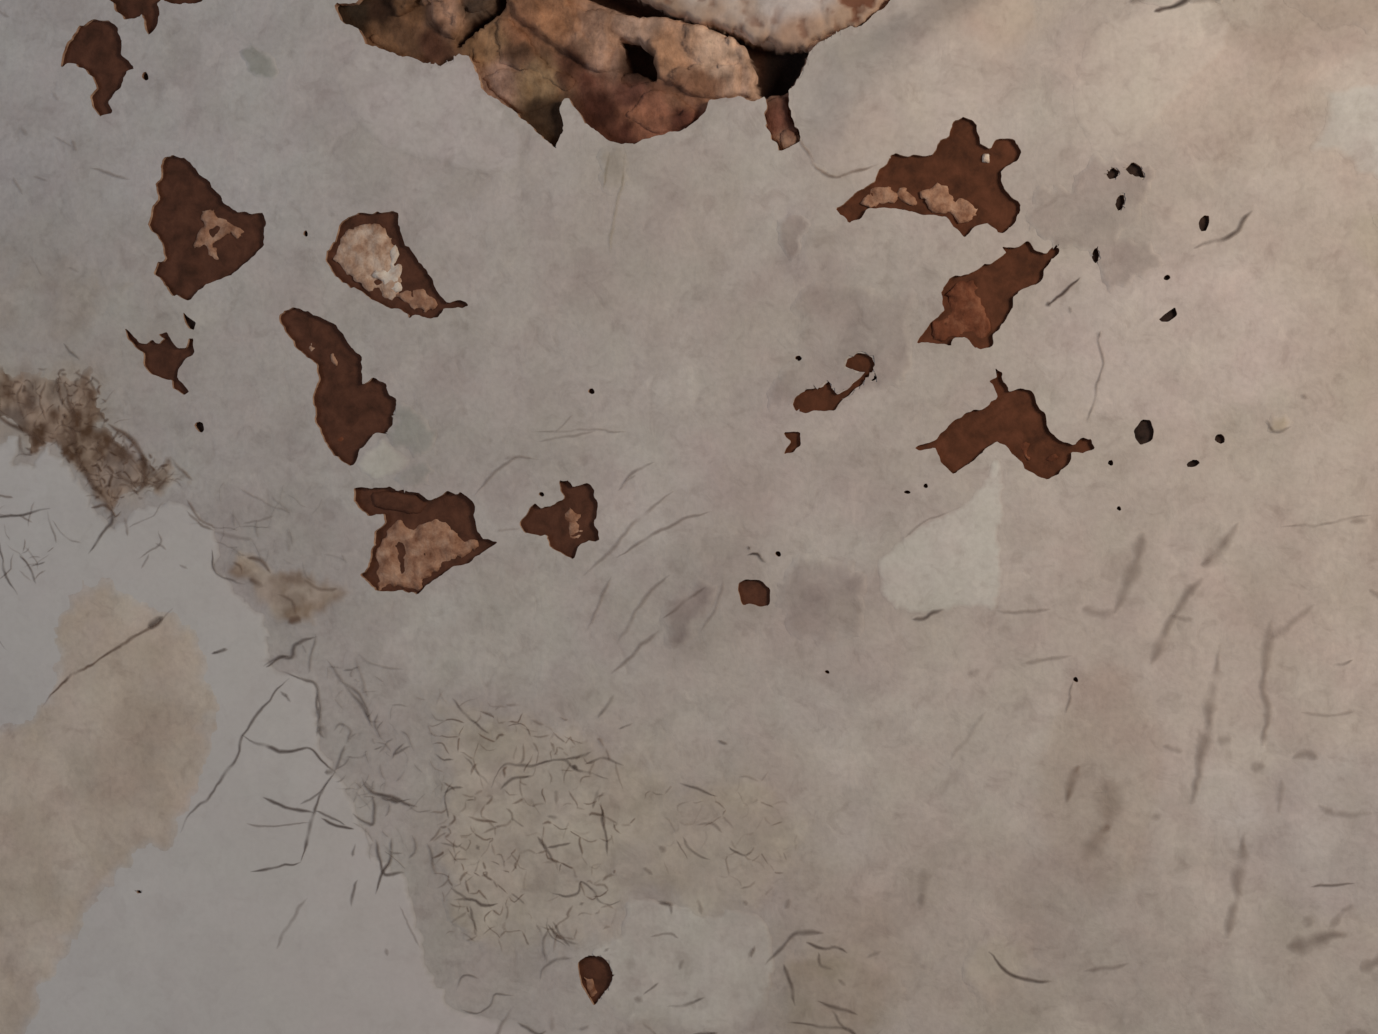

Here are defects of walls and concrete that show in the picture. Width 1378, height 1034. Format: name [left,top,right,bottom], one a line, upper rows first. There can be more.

flaking render [63,0,202,116]
peeling [332,52,522,174]
crack [1139,0,1223,11]
water stain [0,239,199,519]
flaking render [127,156,266,395]
flaking render [281,308,497,594]
flaking render [327,212,468,319]
flaking render [793,353,877,413]
flaking render [837,118,1059,349]
peeling [878,369,1094,620]
water stain [0,577,220,1034]
peeling [0,435,601,1034]